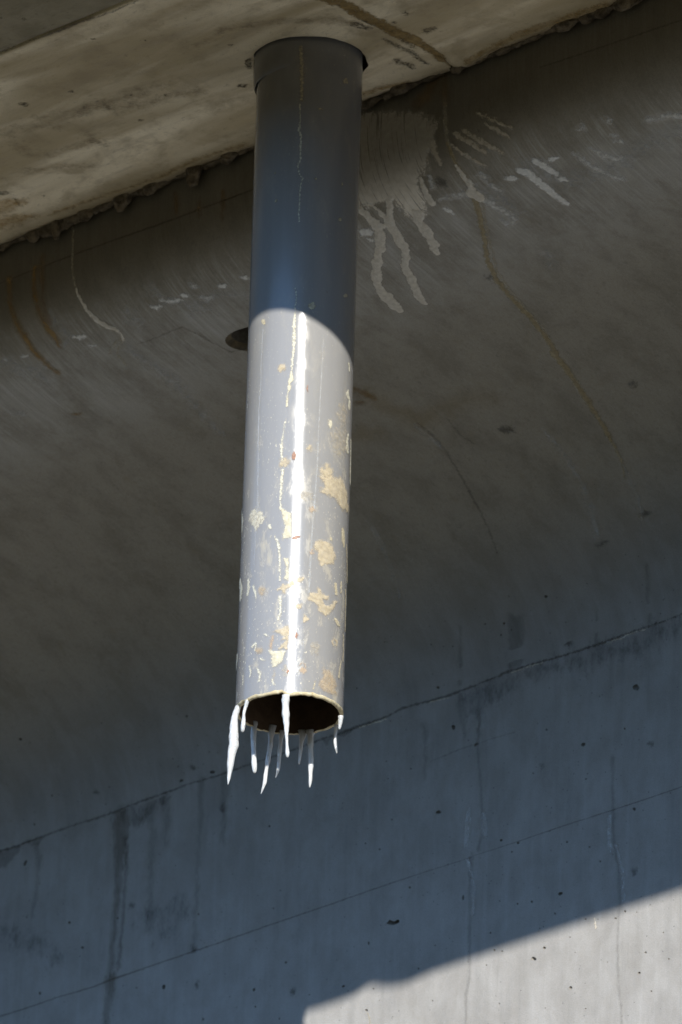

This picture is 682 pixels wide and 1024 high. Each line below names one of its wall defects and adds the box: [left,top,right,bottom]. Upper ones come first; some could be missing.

leakage [72,264,137,365]
leakage [444,106,624,474]